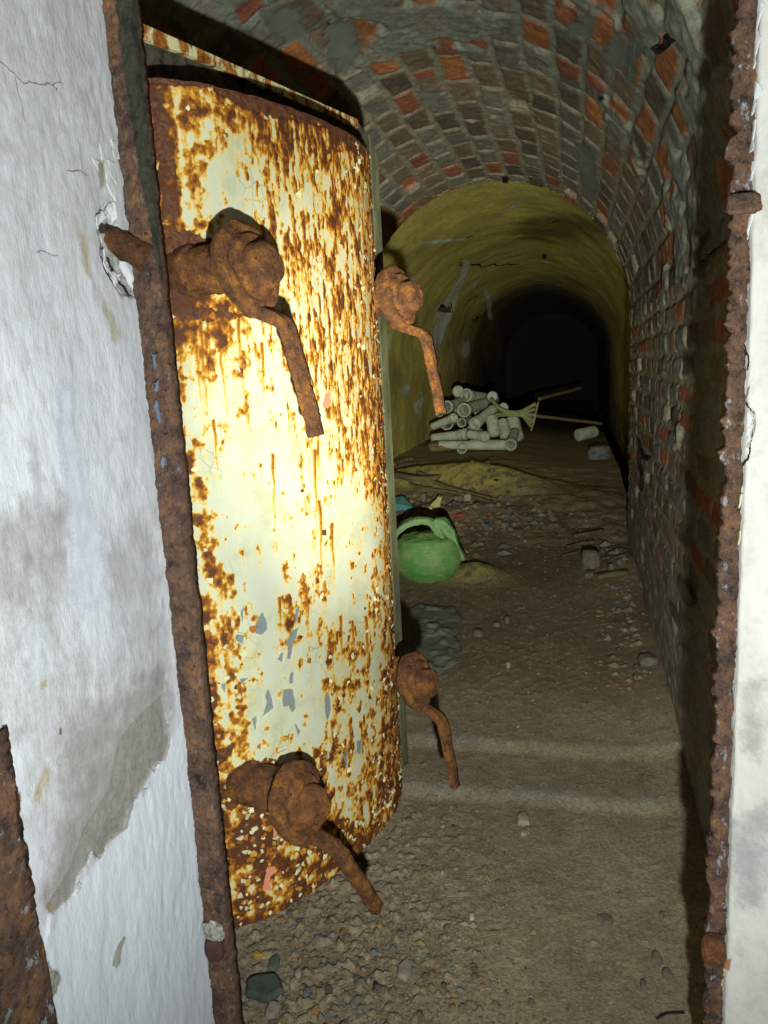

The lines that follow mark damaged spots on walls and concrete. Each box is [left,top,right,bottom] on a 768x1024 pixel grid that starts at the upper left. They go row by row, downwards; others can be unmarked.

crack [0,62,59,121]
flaking render [92,139,135,297]
crack [458,236,518,268]
peeling [303,138,403,851]
peeling [205,630,260,710]
peeling [45,678,170,915]
peeling [217,760,338,926]